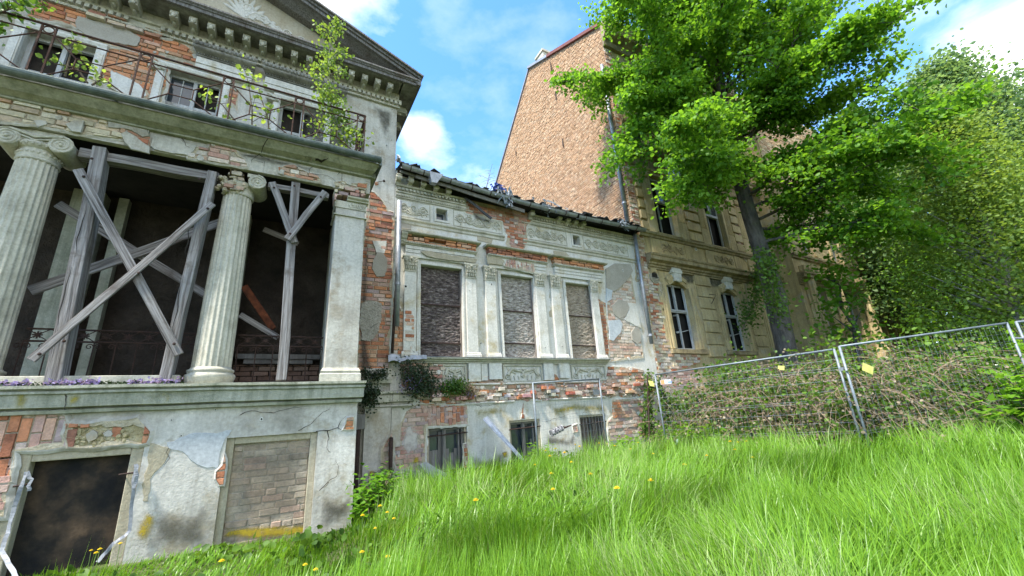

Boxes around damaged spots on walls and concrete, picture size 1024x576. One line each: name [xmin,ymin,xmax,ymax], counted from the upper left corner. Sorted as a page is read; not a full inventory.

flaking render [23,0,197,103]
flaking render [0,98,249,195]
flaking render [277,164,701,473]
flaking render [0,413,155,521]
flaking render [214,452,228,487]
crack [240,407,345,491]